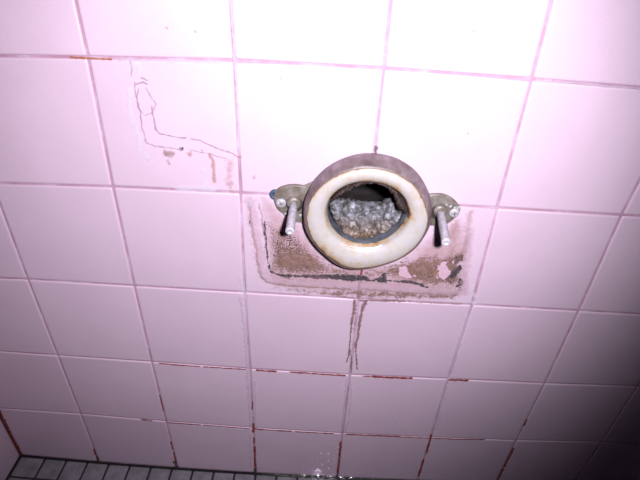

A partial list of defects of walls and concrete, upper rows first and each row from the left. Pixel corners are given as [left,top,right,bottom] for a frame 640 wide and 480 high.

water stain [263,221,429,288]
peeling [399,265,416,279]
peeling [436,260,454,281]
crack [346,270,367,371]
water stain [331,294,461,305]
corrosion [0,410,23,456]
corrosion [167,422,334,468]
corrosion [345,434,485,476]